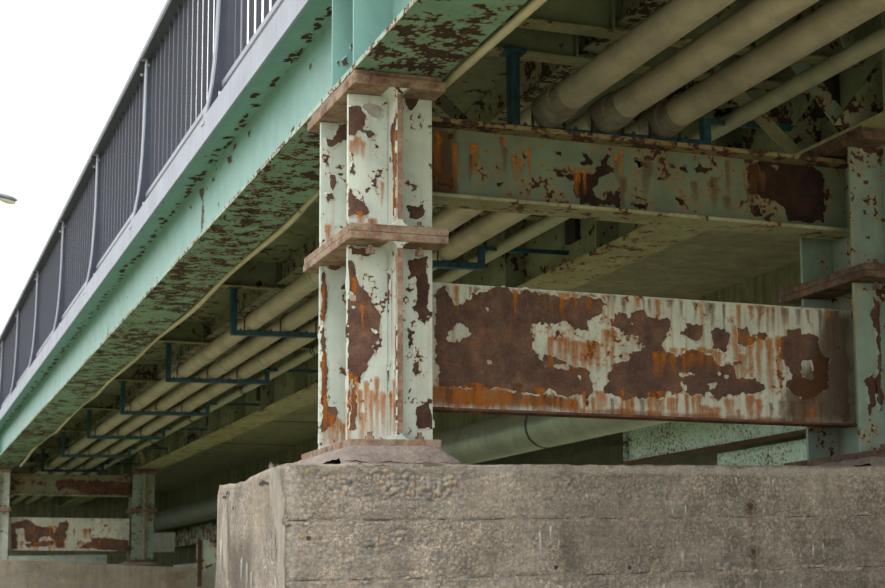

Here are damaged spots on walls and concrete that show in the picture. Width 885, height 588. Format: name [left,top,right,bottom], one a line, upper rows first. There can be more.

peeling [269,7,332,87]
corrosion [553,150,651,210]
corrosion [679,162,716,193]
corrosion [744,160,826,224]
peeling [0,93,261,432]
corrosion [318,245,853,438]
corrosion [864,295,885,416]
corrosion [54,478,132,496]
corrosion [10,519,130,551]